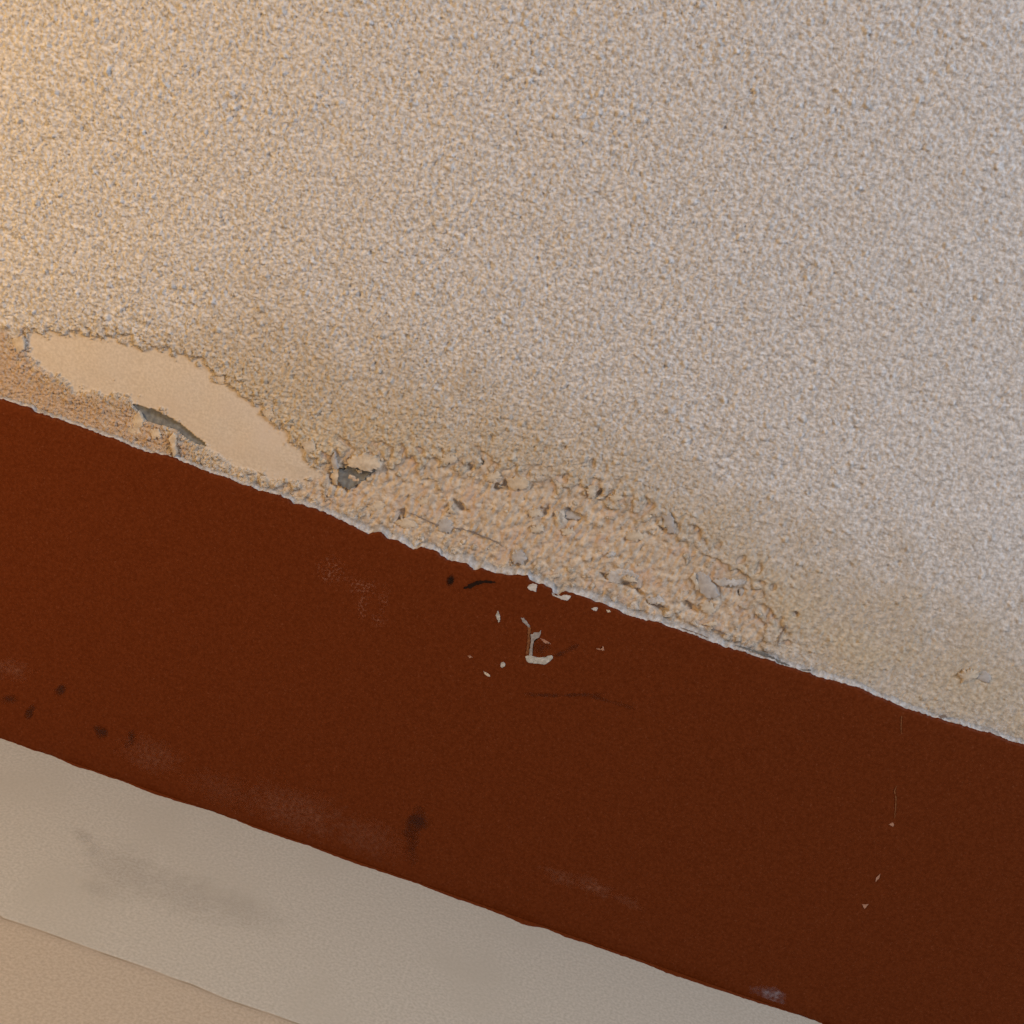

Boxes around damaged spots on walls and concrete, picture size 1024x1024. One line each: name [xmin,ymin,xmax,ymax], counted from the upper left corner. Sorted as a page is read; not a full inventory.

flaking render [12,327,798,653]
peeling [521,618,553,665]